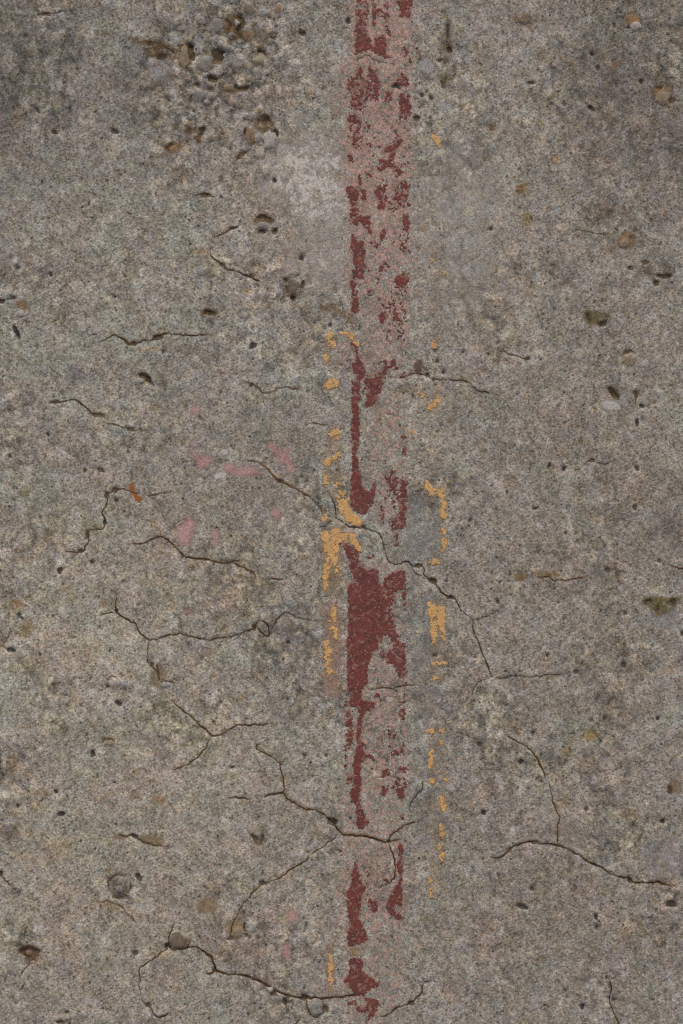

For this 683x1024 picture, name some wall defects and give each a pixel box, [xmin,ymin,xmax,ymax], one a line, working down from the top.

spalling [443,26,452,53]
crack [100,332,205,346]
crack [66,488,167,554]
crack [133,536,282,580]
peeling [319,0,449,1024]
crack [248,460,560,700]
crack [537,574,583,582]
crack [100,597,308,681]
crack [173,702,423,934]
crack [491,736,674,886]
crack [138,923,357,1024]
crack [383,981,428,1016]